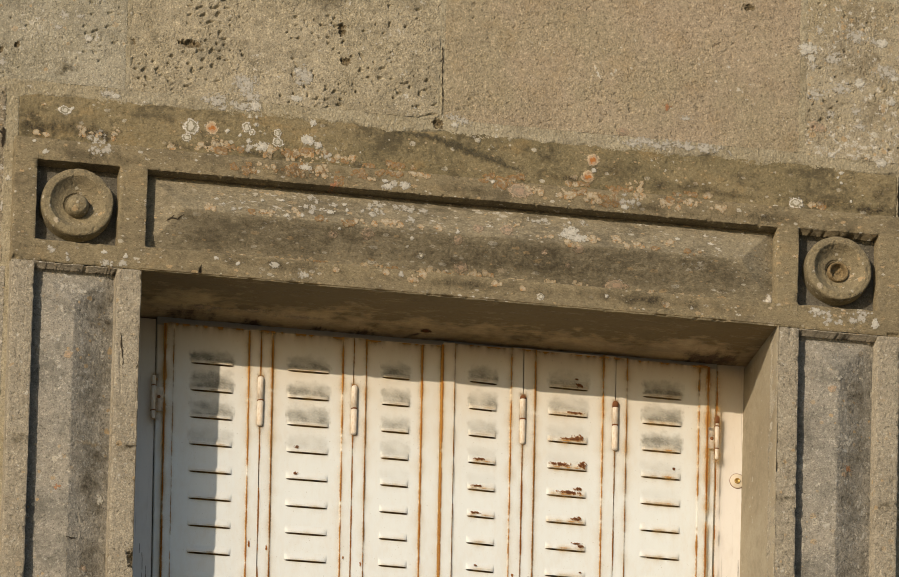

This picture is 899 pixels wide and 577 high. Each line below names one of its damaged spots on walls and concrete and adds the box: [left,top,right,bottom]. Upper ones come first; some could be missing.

water stain [138,268,779,365]
rust [151,323,223,577]
rust [236,328,283,577]
rust [402,329,431,577]
rust [437,344,455,577]